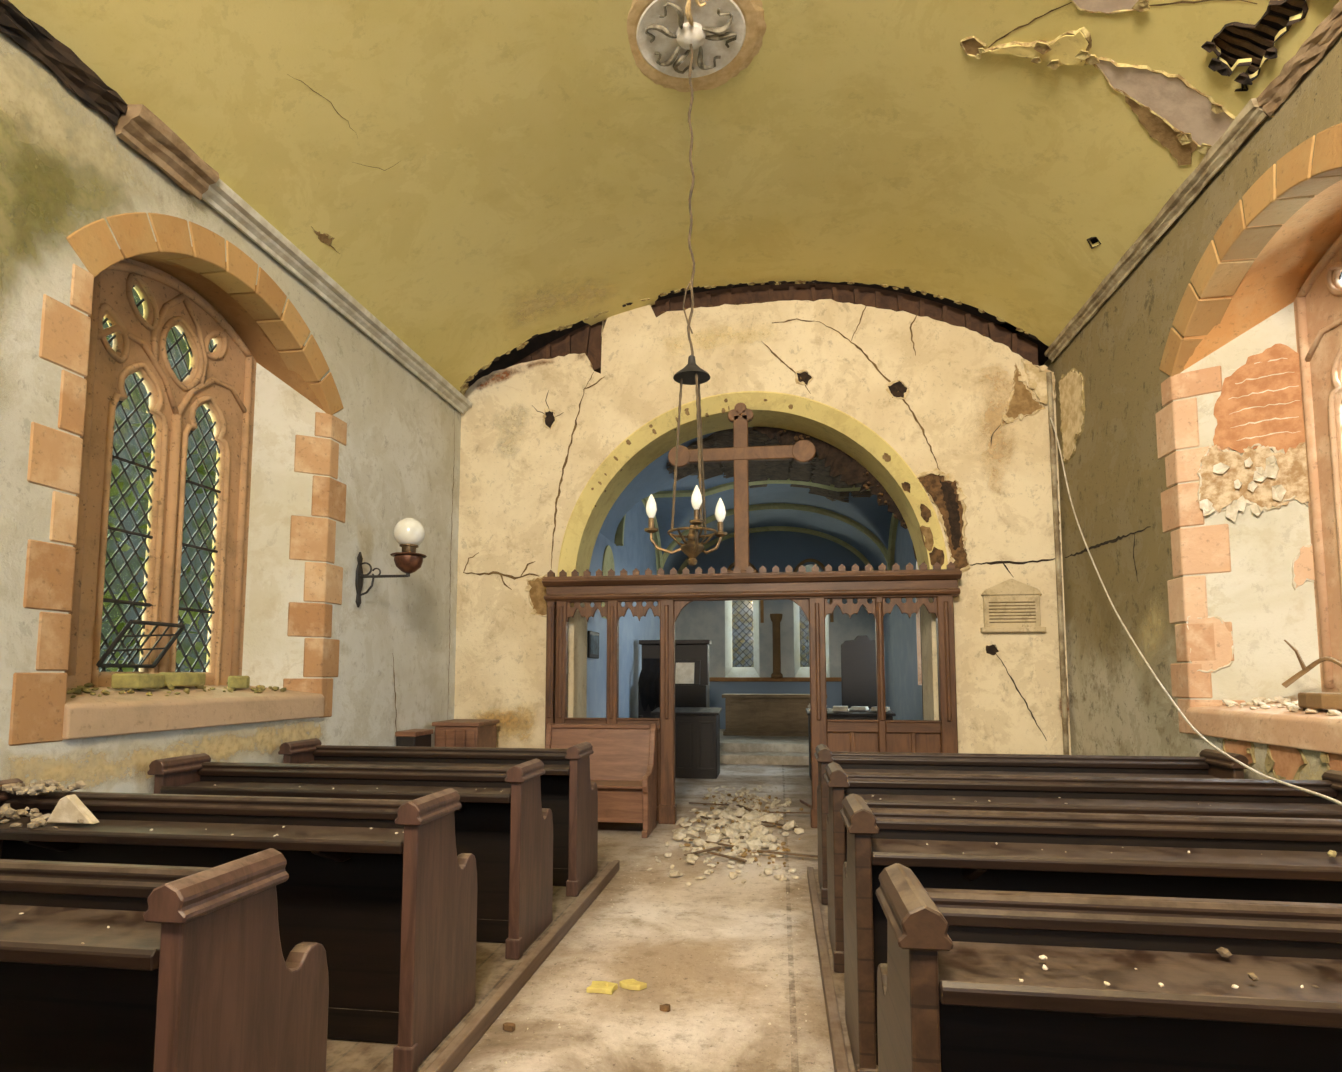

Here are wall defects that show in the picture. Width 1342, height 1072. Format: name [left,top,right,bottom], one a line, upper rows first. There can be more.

peeling [982,0,1257,166]
water stain [0,53,141,307]
crack [447,372,605,720]
spalling [460,280,1086,464]
crack [765,303,940,470]
spalling [901,468,970,573]
flaking render [1197,343,1310,522]
water stain [11,723,321,787]